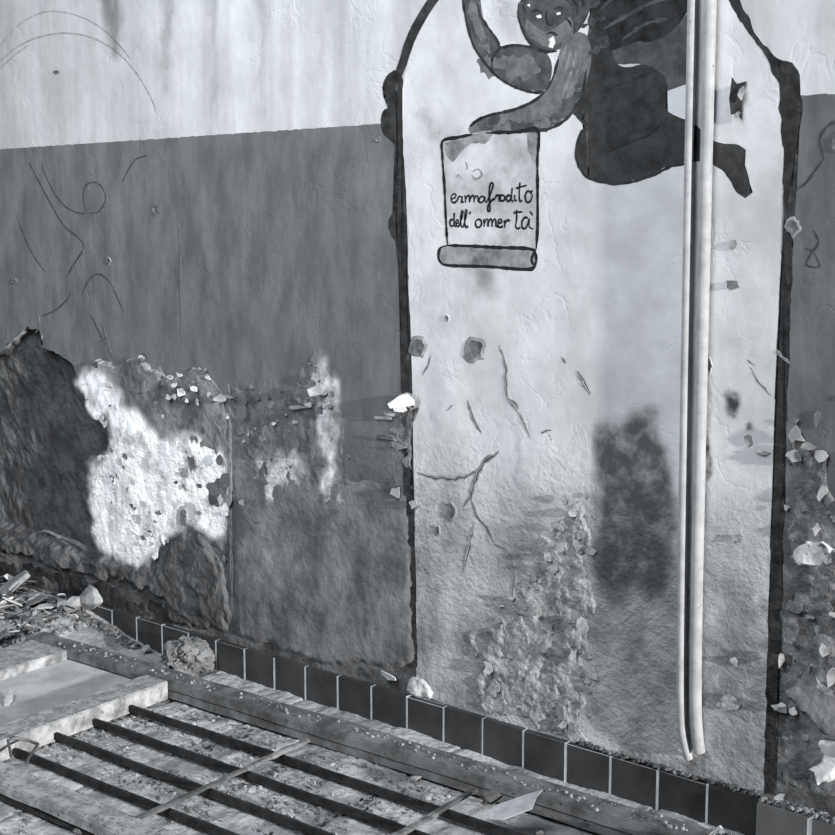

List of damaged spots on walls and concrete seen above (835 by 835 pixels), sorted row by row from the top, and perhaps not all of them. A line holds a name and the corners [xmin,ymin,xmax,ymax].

flaking render [0,327,350,632]
peeling [374,392,419,469]
crack [447,400,482,433]
crack [416,451,517,608]
spalling [468,492,598,745]
flaking render [771,418,835,804]